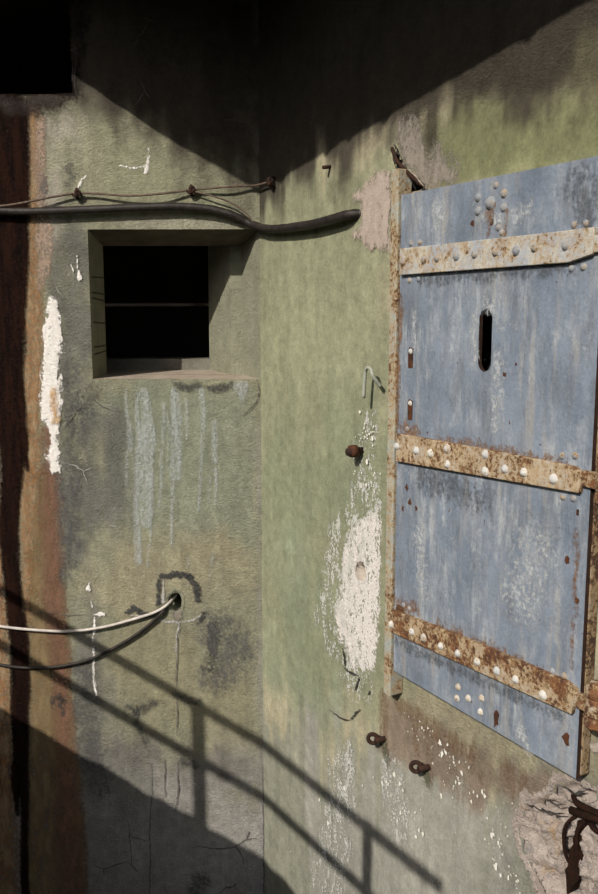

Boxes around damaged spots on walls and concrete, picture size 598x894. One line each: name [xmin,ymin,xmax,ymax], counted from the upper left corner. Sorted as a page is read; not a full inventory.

peeling [351,115,460,253]
rust [0,94,88,894]
damp [127,391,162,564]
damp [168,383,248,491]
peeling [313,410,383,703]
crack [94,759,199,894]
crack [192,765,265,894]
peeling [407,721,469,799]
spalling [481,771,598,894]